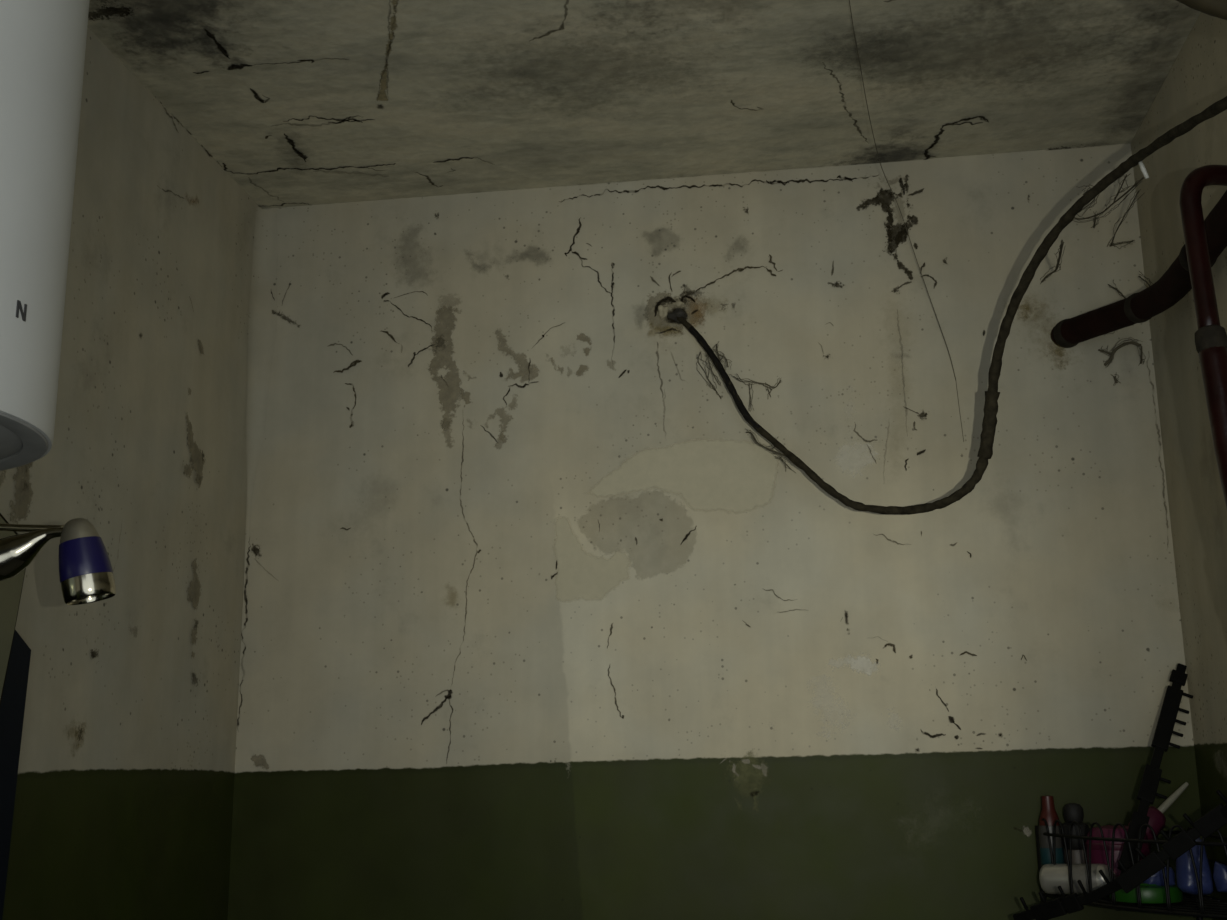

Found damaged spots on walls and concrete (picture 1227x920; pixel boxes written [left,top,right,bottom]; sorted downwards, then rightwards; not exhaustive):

damp [377,0,397,108]
crack [160,29,473,187]
crack [924,116,989,160]
crack [381,291,432,367]
spalling [644,271,704,333]
crack [559,175,878,343]
spalling [856,175,937,293]
crack [329,343,362,428]
spalling [184,412,206,485]
crack [421,425,499,764]
crack [607,623,624,719]
crack [921,689,985,749]